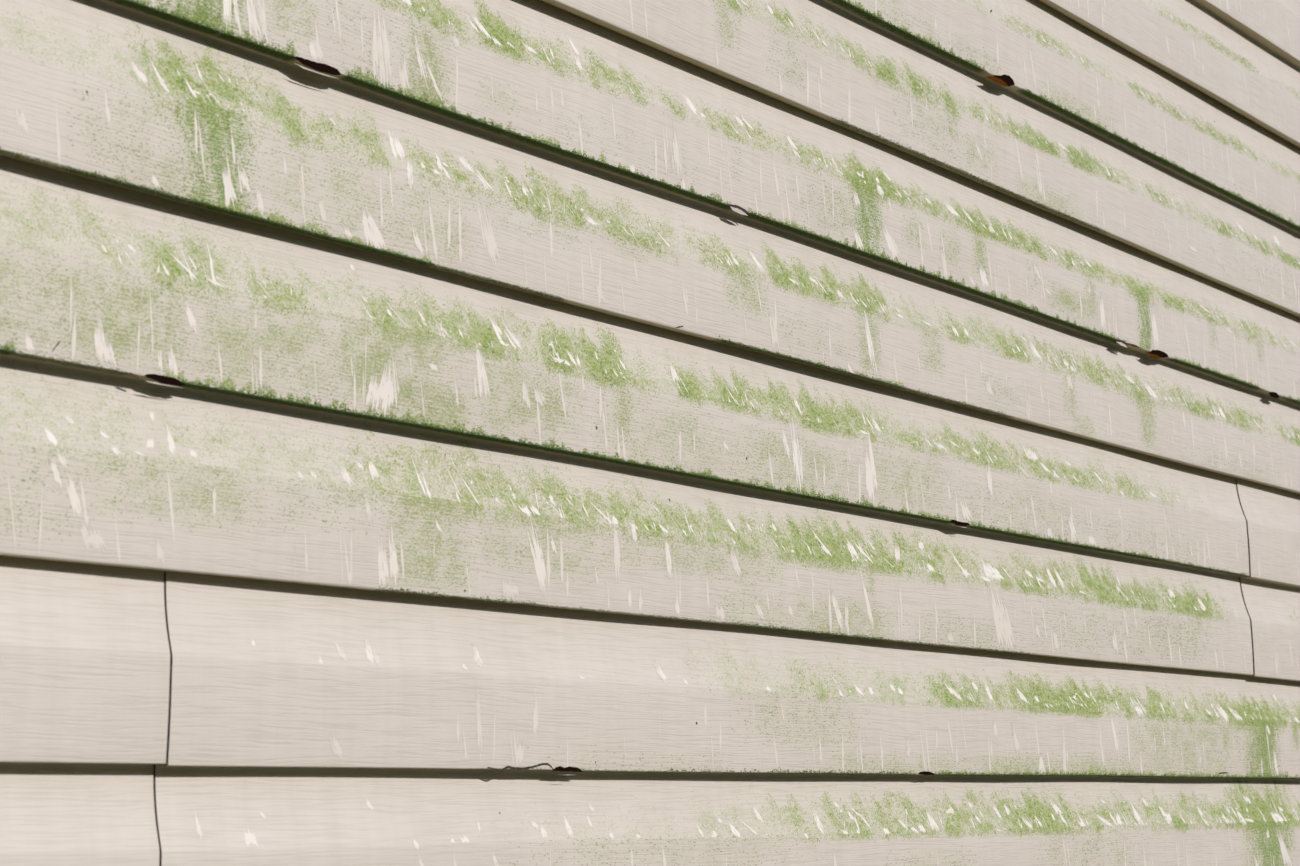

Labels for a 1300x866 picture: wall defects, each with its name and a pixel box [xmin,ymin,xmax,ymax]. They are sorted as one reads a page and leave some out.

leakage [361,0,554,113]
leakage [130,58,245,183]
leakage [222,122,264,214]
leakage [681,92,1118,339]
leakage [137,244,223,376]
leakage [351,342,438,420]
leakage [360,295,523,400]
leakage [541,336,638,460]
leakage [768,396,996,523]
leakage [445,459,1086,655]
leakage [889,680,1206,775]
leakage [804,793,1300,866]